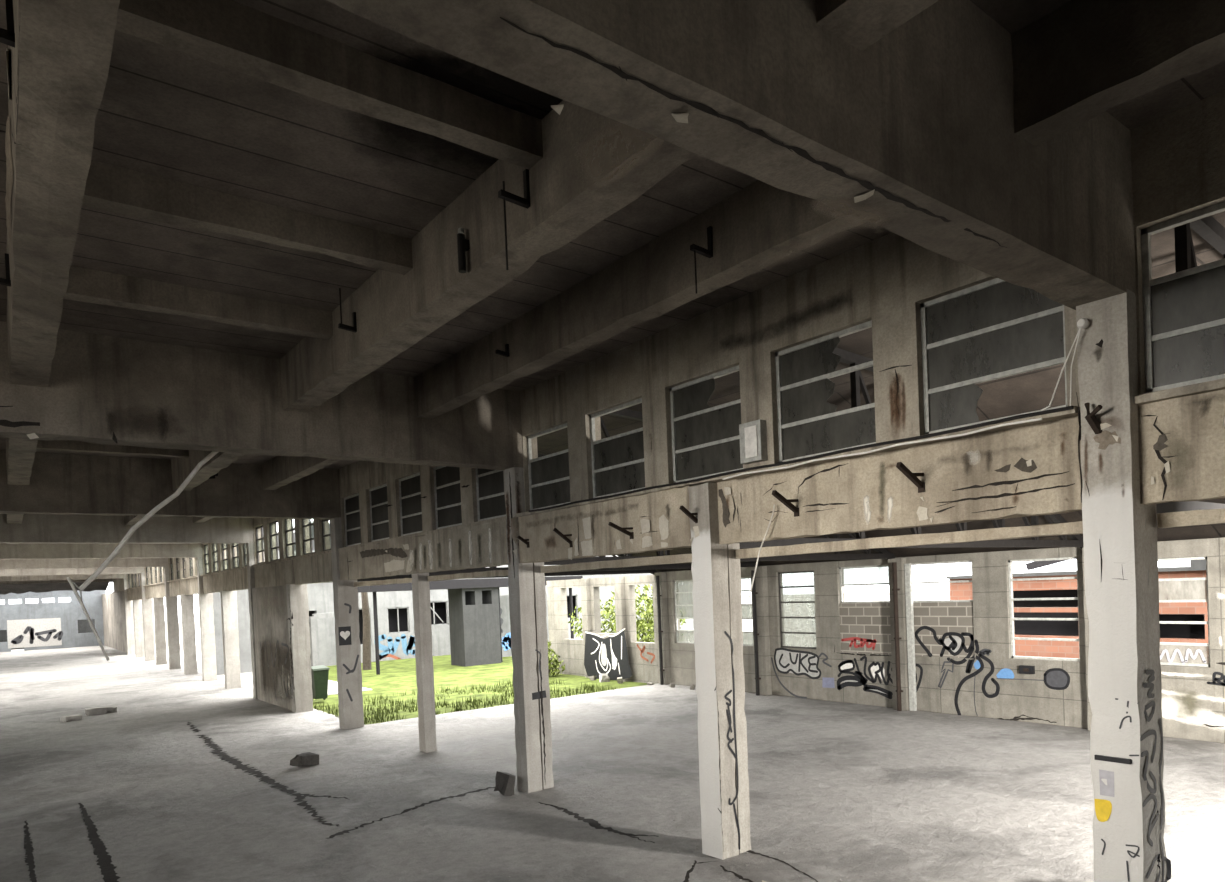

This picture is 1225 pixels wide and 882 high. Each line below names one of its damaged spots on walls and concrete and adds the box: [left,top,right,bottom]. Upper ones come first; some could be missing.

crack [500,17,1007,248]
crack [1145,415,1175,500]